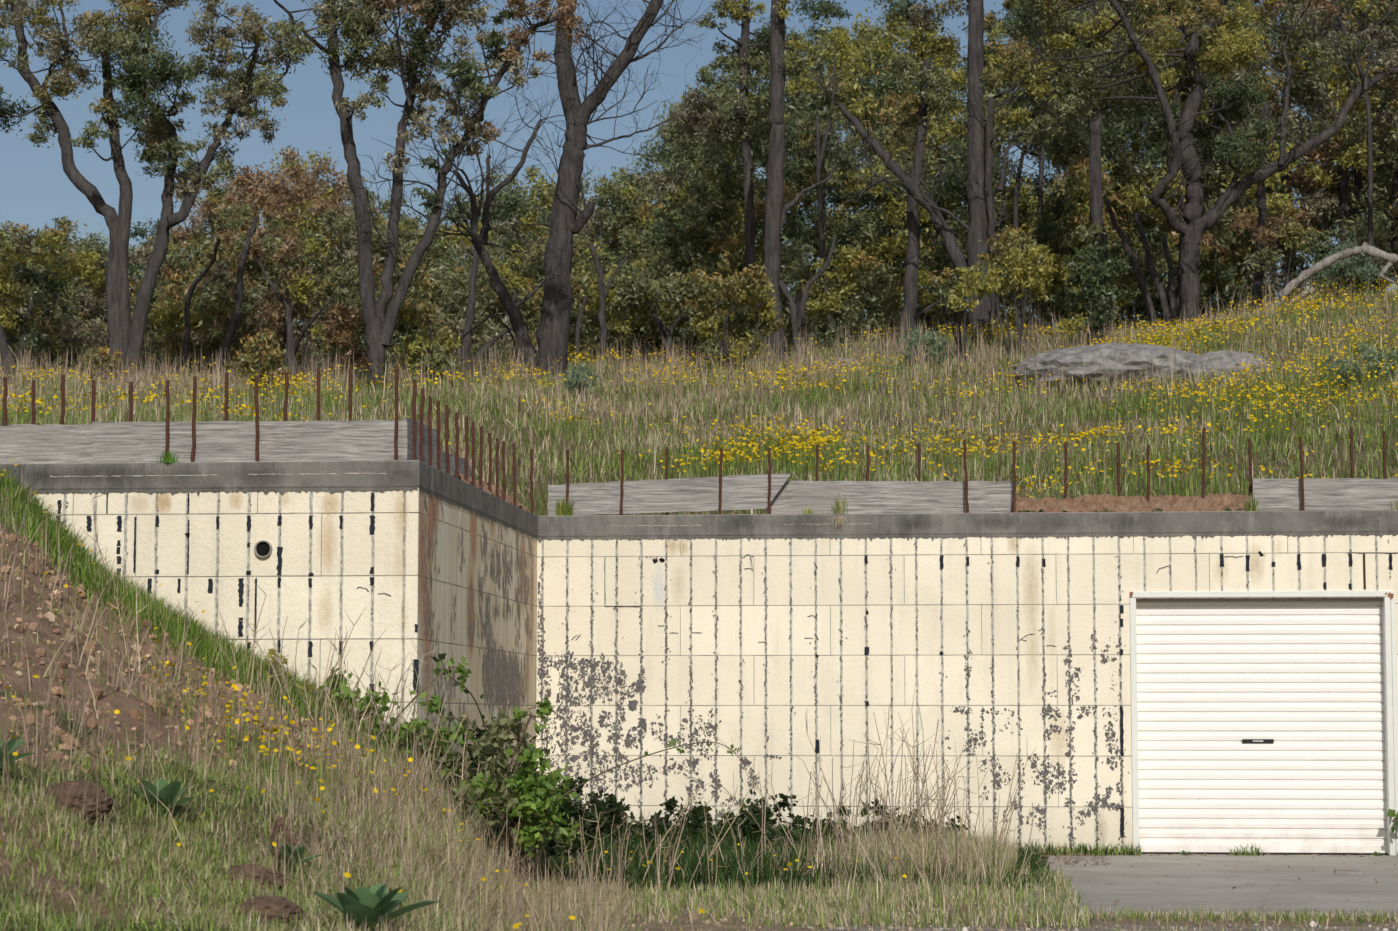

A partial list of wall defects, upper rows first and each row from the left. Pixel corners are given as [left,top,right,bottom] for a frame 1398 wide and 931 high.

corrosion [419,495,439,668]
peeling [413,493,796,825]
peeling [809,545,822,800]
peeling [837,571,847,821]
peeling [936,536,1129,857]